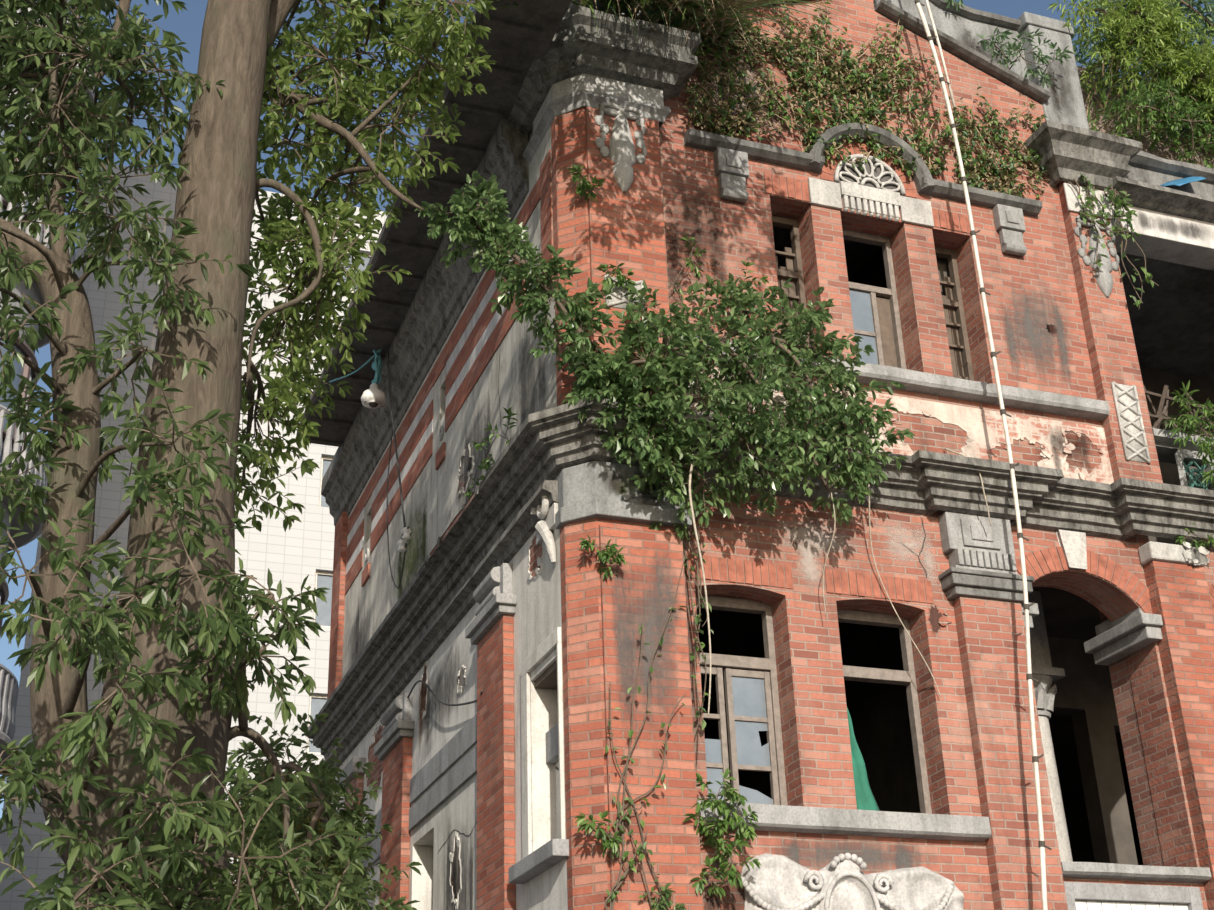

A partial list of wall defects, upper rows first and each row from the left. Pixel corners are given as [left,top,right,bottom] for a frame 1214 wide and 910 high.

water stain [1007,298,1069,373]
flaking render [850,409,1104,480]
water stain [617,569,673,699]